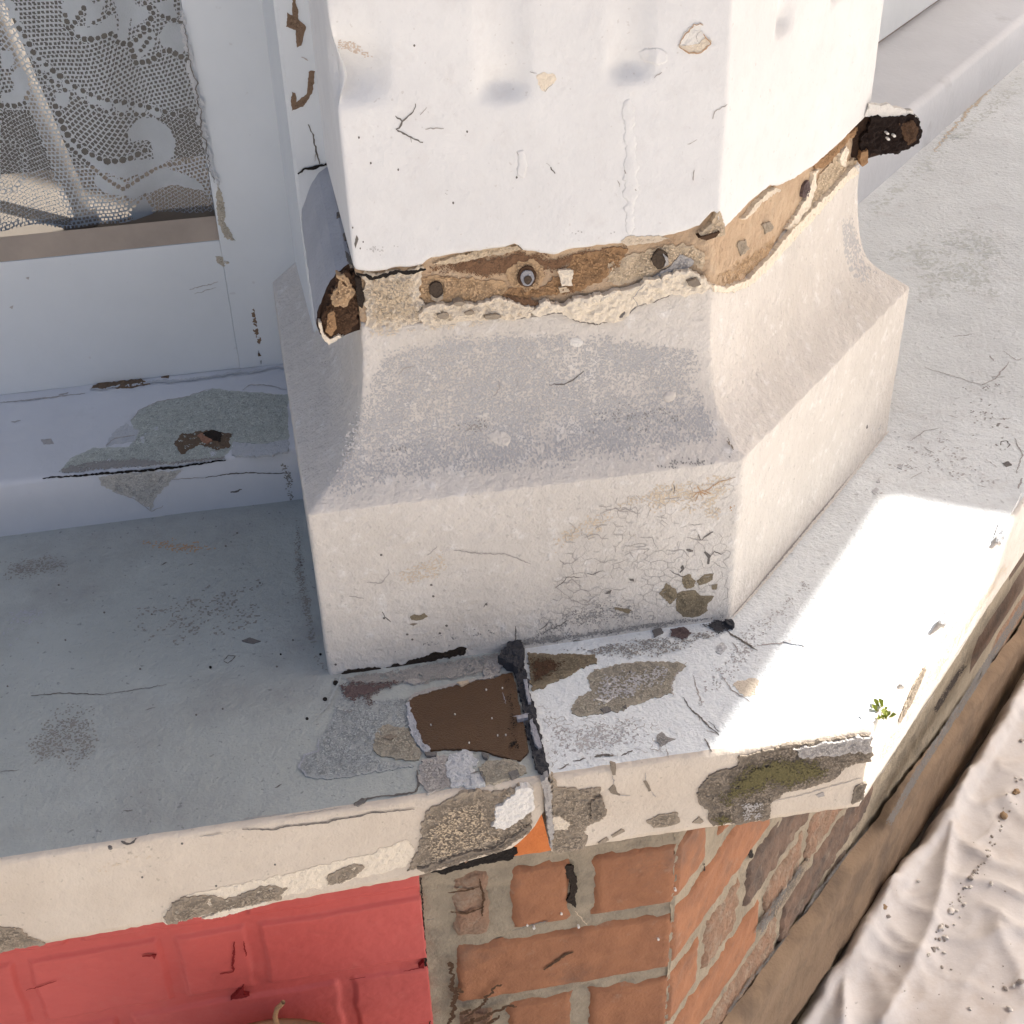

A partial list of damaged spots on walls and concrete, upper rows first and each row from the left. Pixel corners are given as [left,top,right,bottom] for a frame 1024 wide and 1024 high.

peeling [286,0,306,47]
peeling [291,71,315,110]
crack [396,104,444,143]
spalling [343,127,859,332]
rust [503,246,628,307]
peeling [60,388,290,510]
crack [43,460,284,512]
crack [514,477,806,654]
spalling [659,573,717,618]
crack [31,685,163,710]
peeling [162,652,597,925]
spalling [646,732,874,828]